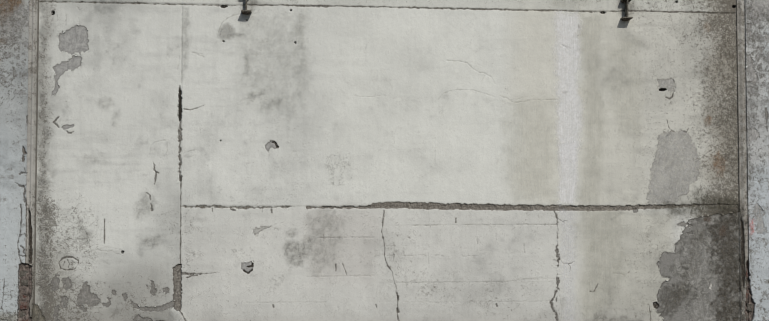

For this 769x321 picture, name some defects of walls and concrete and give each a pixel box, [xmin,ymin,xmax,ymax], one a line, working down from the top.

peeling [51,24,91,96]
crack [178,87,204,278]
peeling [647,128,702,206]
spalling [16,208,182,321]
spalling [241,261,254,274]
crack [550,245,570,321]
peeling [653,203,765,321]